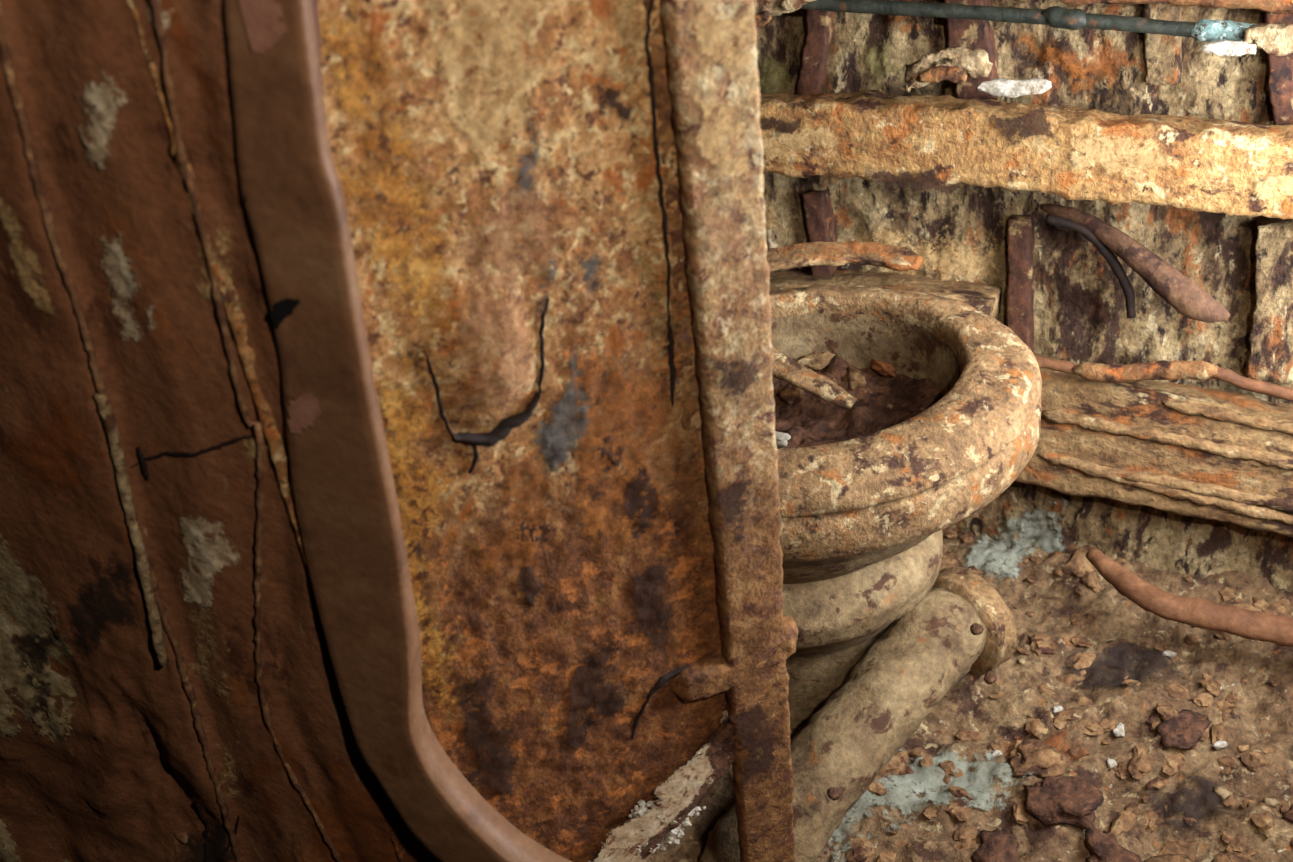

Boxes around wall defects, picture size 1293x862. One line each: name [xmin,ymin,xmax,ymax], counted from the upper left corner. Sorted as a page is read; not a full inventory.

corrosion [754,0,815,33]
peeling [73,72,127,170]
corrosion [597,84,635,130]
corrosion [760,117,802,134]
corrosion [990,107,1059,146]
corrosion [871,170,960,195]
corrosion [1071,285,1112,342]
corrosion [318,0,519,797]
crack [423,298,550,474]
crack [131,429,264,480]
peeling [0,530,86,746]
corrosion [567,559,673,754]